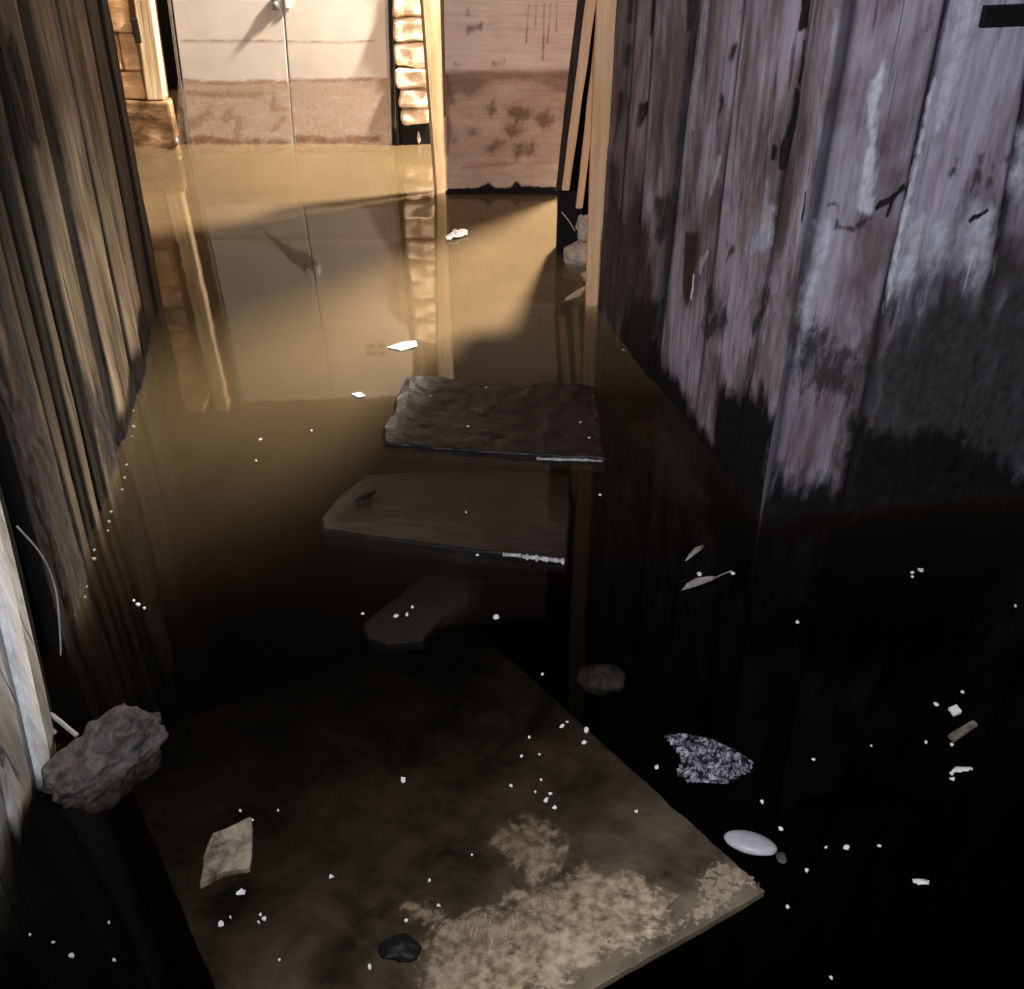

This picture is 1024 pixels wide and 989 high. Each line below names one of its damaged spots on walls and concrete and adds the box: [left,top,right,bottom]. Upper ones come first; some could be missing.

water stain [490,108,550,158]
peeling [886,79,936,301]
water stain [598,90,1024,653]